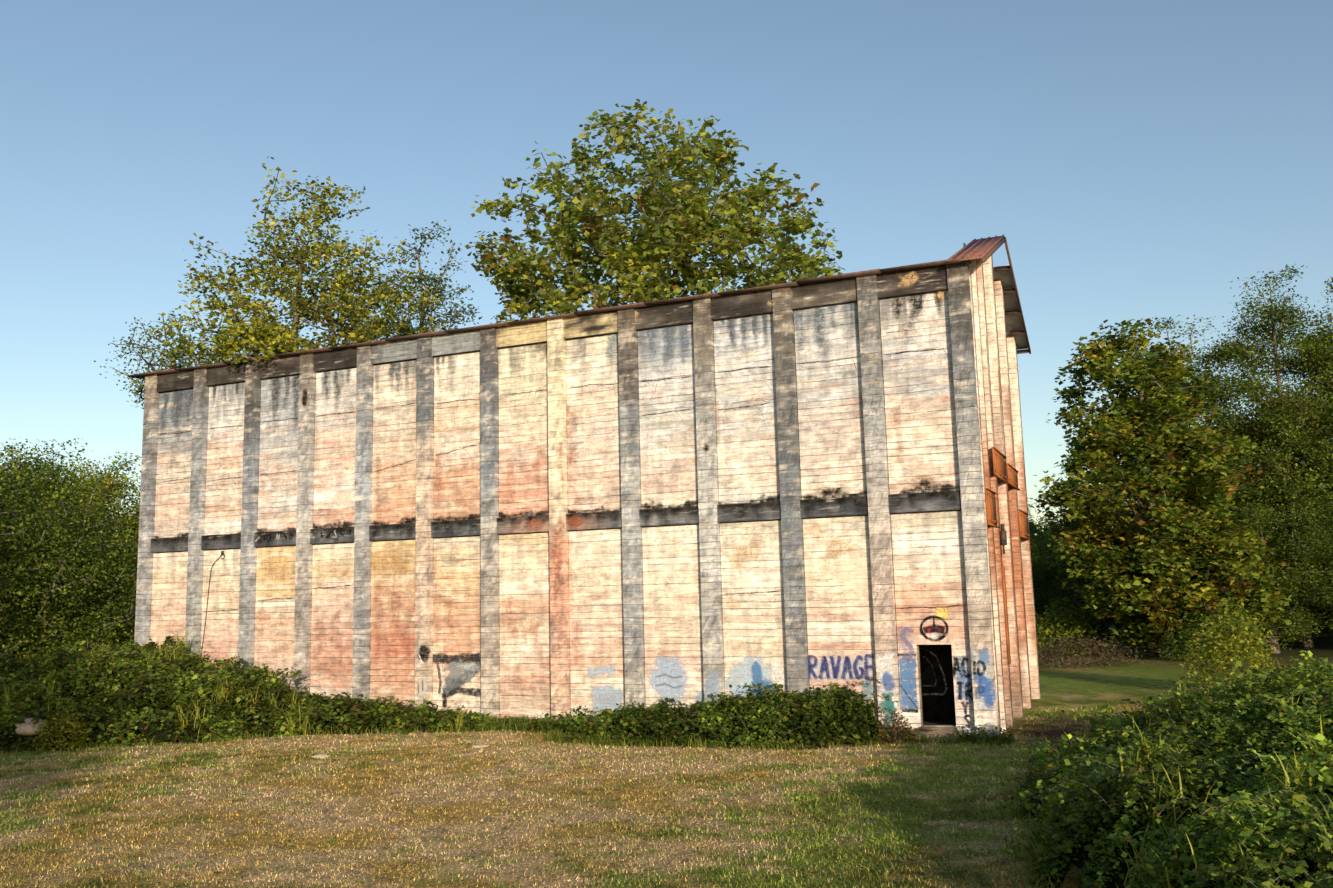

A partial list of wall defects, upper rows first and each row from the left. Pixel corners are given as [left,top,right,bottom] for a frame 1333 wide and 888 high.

leakage [794,305,852,347]
leakage [892,292,941,327]
leakage [804,498,863,508]
corrosion [993,474,1026,626]